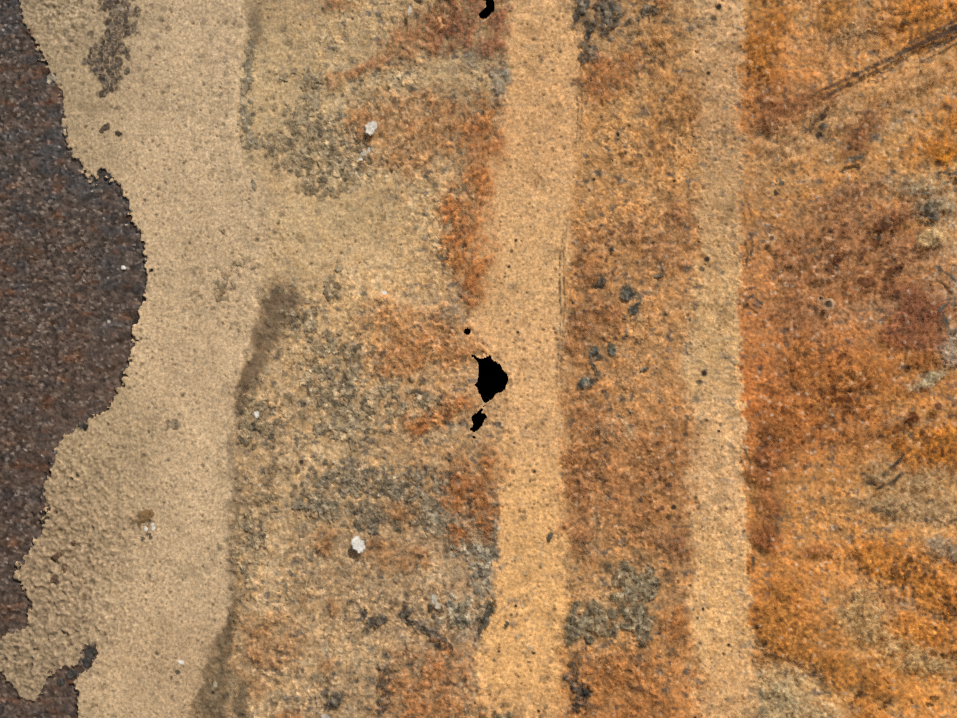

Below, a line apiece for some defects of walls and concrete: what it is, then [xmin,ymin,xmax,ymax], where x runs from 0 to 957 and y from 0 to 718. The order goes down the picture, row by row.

corrosion [327,0,513,90]
corrosion [742,0,841,131]
corrosion [816,0,957,49]
corrosion [905,91,957,169]
corrosion [344,88,507,308]
peeling [0,0,155,640]
water stain [236,284,299,415]
corrosion [746,177,957,551]
peeling [0,644,98,718]
corrosion [385,639,471,718]
corrosion [749,576,897,718]
corrosion [801,529,957,650]